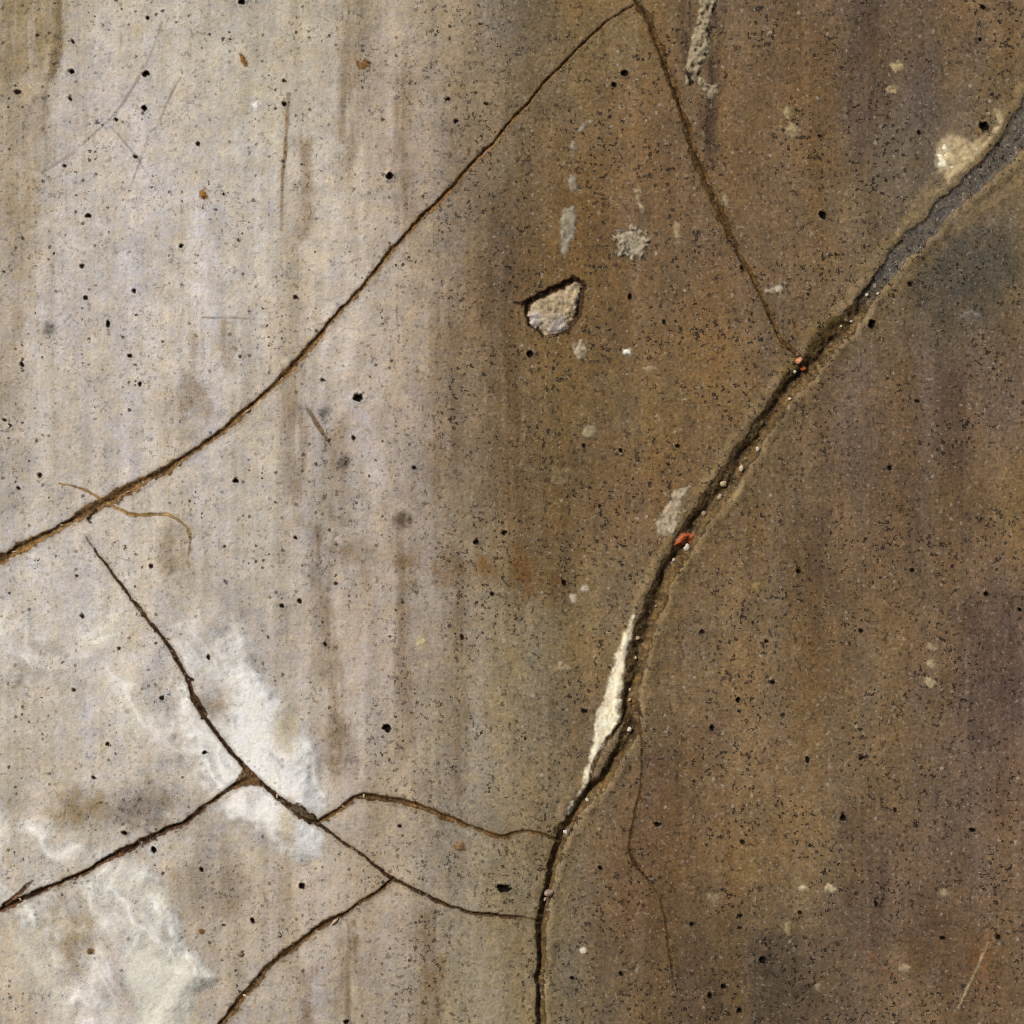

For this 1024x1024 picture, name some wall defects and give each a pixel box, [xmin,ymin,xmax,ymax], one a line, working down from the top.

crack [0,549,559,1024]
crack [0,5,634,565]
spalling [514,275,587,359]
crack [520,0,1024,1024]